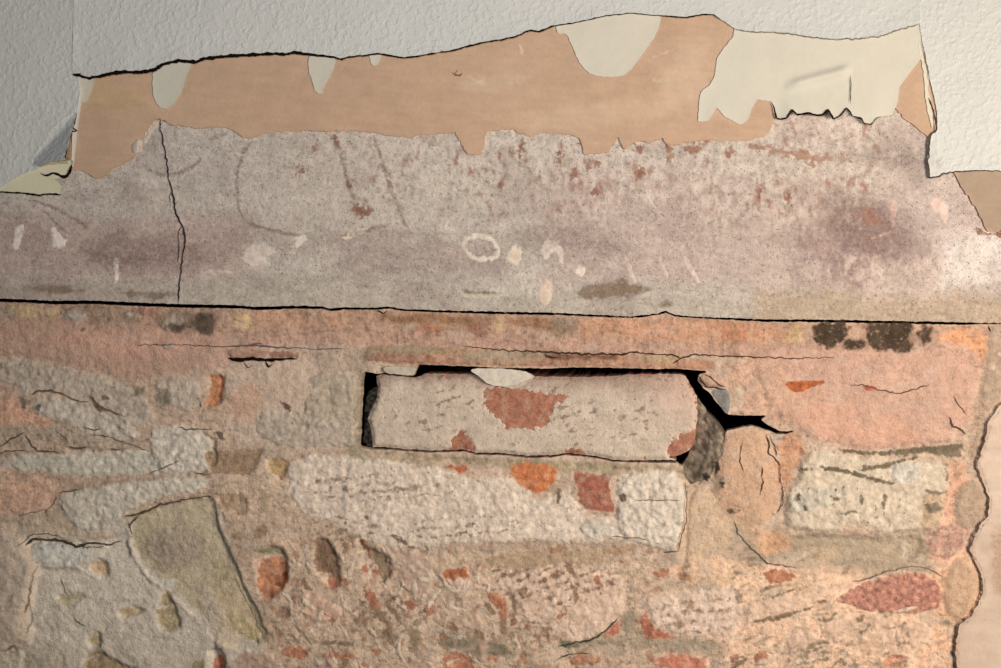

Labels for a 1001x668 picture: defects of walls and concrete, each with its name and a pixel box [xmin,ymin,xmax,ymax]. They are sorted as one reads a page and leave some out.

crack [0,115,992,331]
spalling [0,108,1001,323]
crack [0,389,224,651]
spalling [0,302,1001,668]